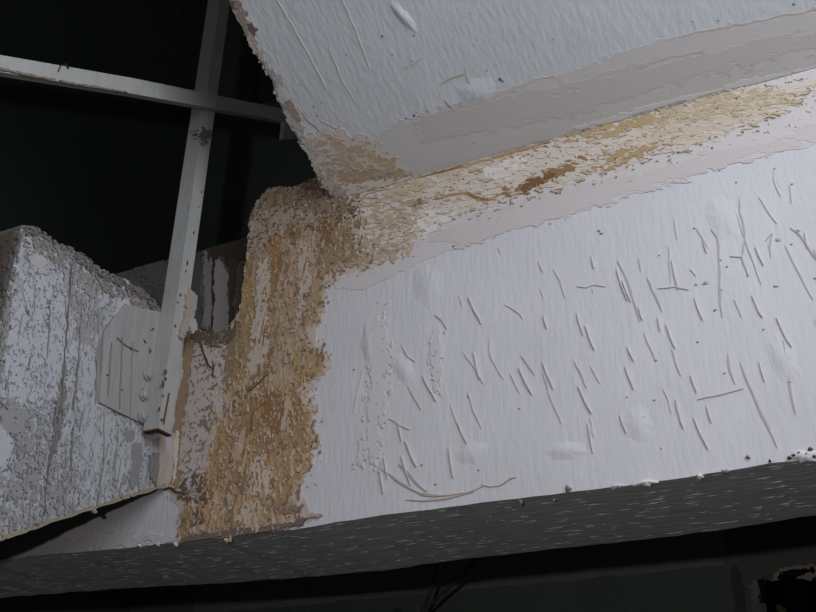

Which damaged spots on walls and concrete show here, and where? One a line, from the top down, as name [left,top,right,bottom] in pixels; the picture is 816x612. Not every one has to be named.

peeling [0,225,229,541]
damp [25,205,314,557]
damp [230,0,816,536]